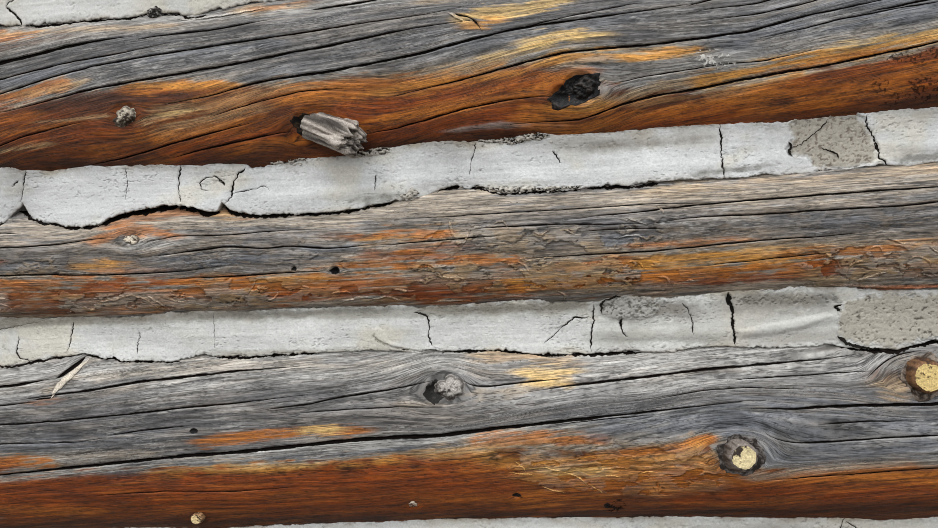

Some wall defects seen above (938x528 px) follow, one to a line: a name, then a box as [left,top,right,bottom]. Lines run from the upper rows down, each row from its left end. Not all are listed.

crack [0,0,938,202]
spalling [787,113,877,171]
crack [0,186,938,279]
spalling [837,289,938,349]
crack [0,293,938,476]